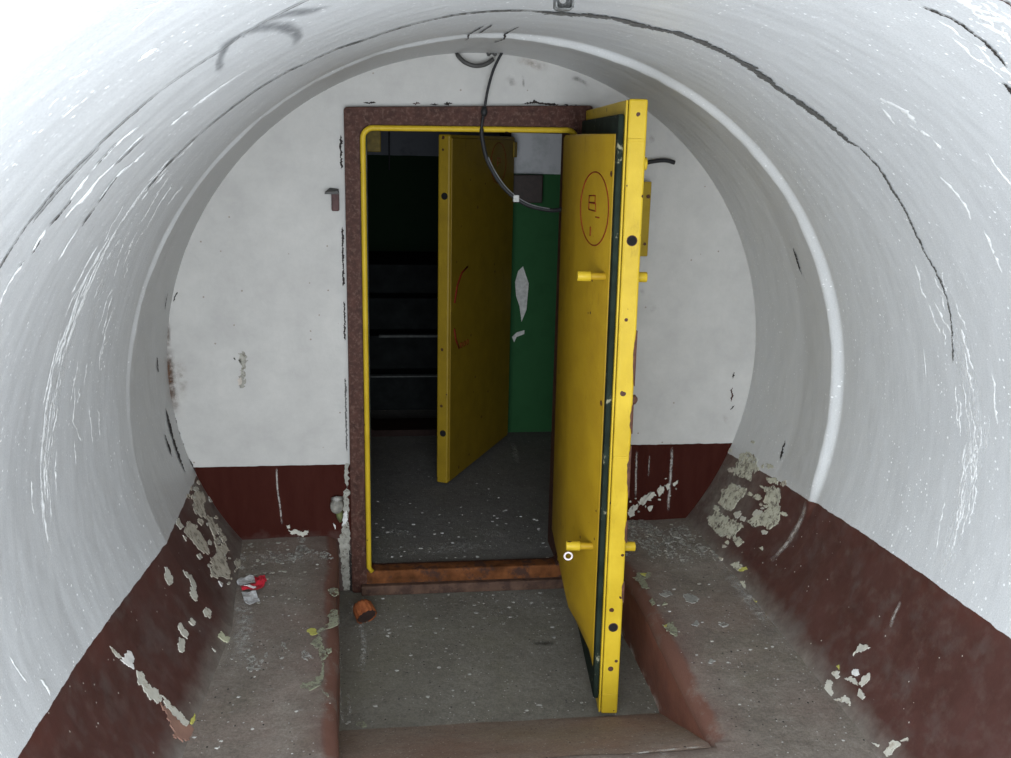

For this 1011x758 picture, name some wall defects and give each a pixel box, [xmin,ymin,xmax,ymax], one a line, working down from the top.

crack [910,0,1011,94]
crack [0,0,308,268]
peeling [176,480,246,587]
peeling [625,441,787,606]
peeling [110,646,195,742]
peeling [824,665,870,706]
peeling [872,737,908,757]